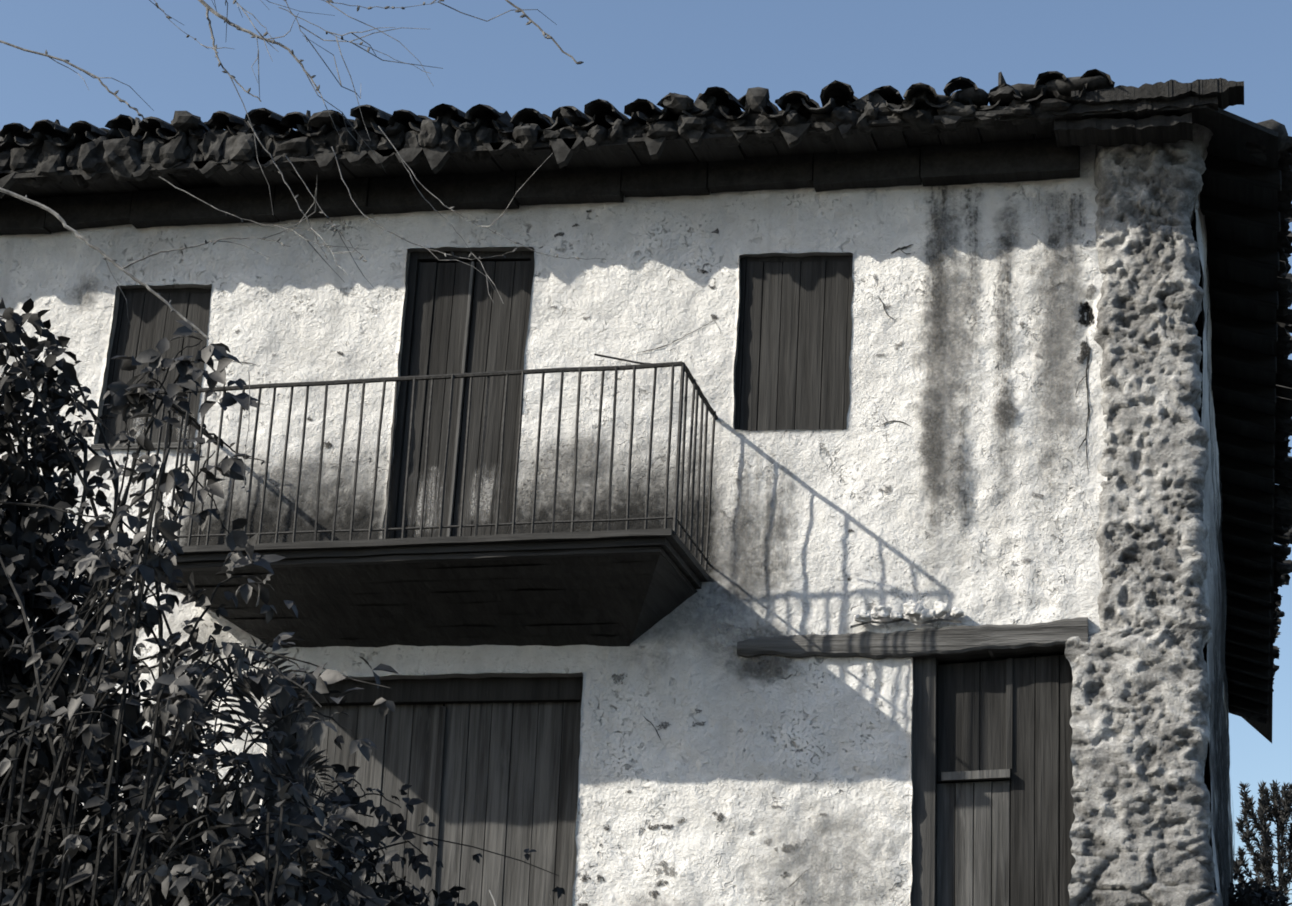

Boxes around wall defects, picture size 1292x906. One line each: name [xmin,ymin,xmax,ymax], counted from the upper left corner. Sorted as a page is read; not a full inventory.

damp [913,185,979,526]
damp [995,208,1017,475]
damp [1031,195,1085,478]
flaking render [850,601,964,628]